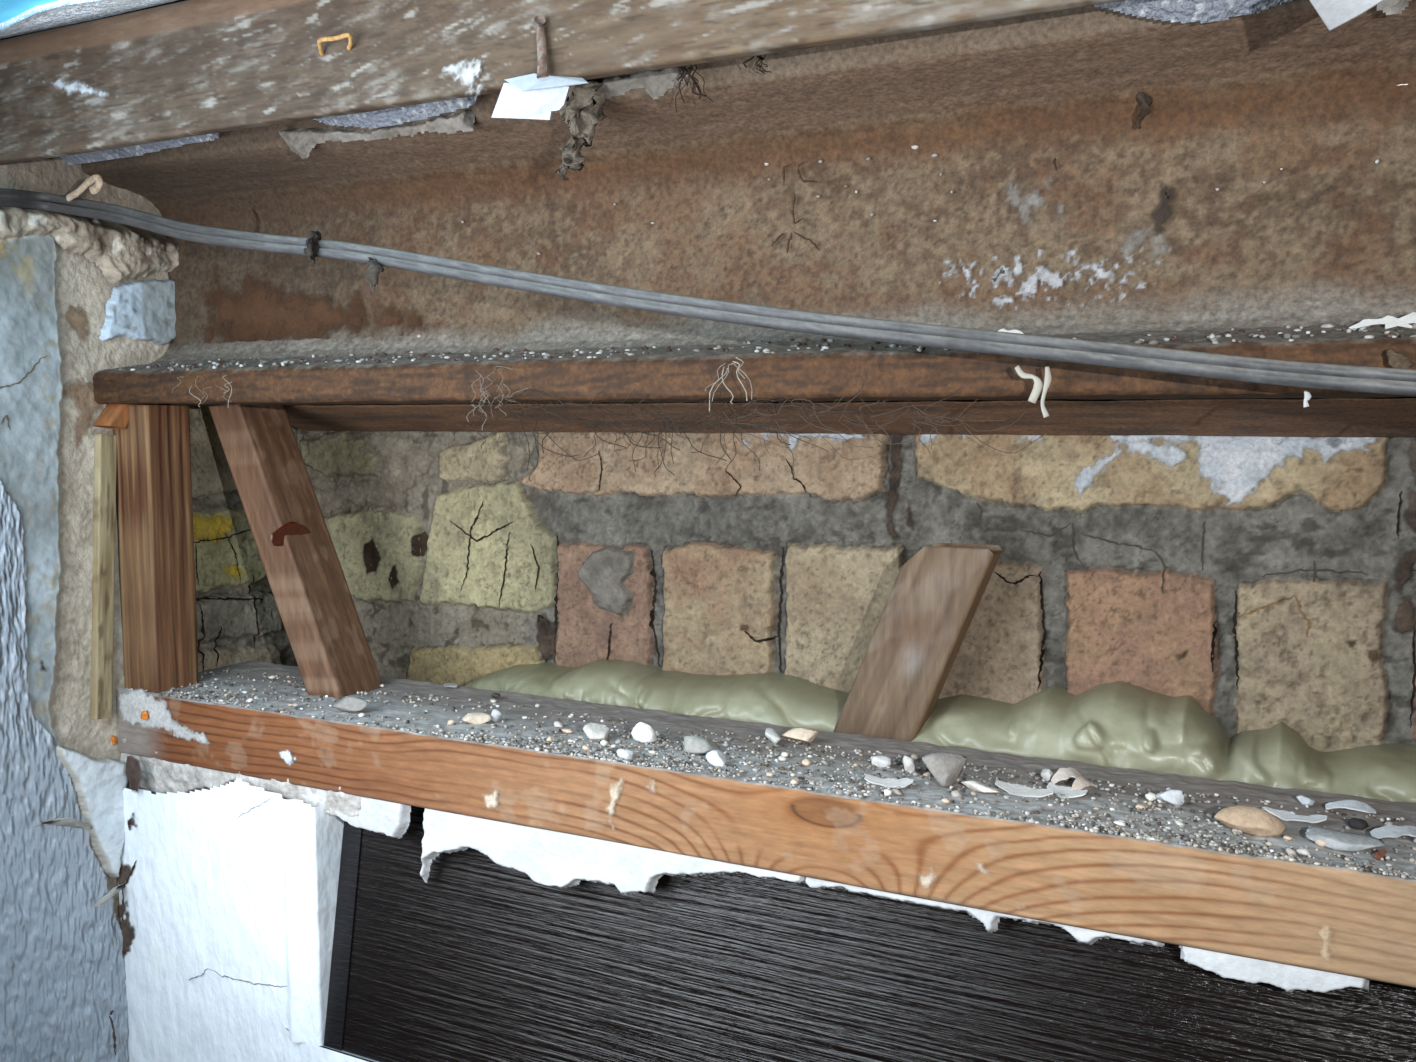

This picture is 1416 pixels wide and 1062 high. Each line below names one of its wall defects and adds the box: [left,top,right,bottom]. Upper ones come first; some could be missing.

corrosion [1151,186,1172,235]
corrosion [205,277,421,344]
water stain [1074,435,1377,504]
peeling [0,207,361,907]
crack [450,501,559,662]
crack [1408,629,1416,727]